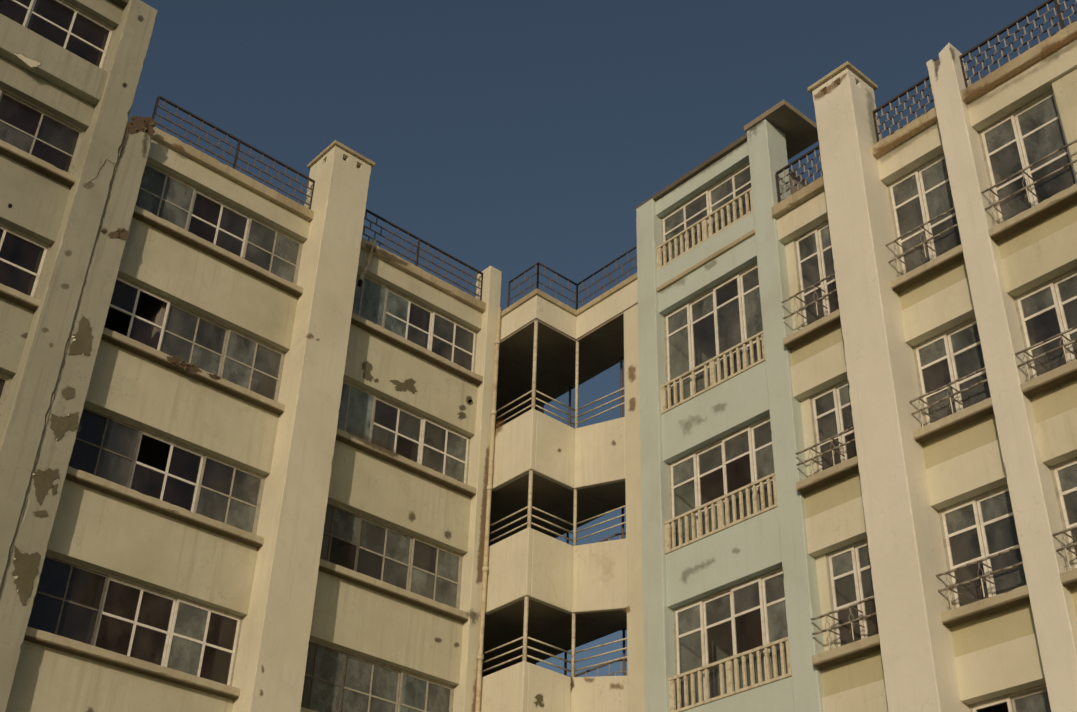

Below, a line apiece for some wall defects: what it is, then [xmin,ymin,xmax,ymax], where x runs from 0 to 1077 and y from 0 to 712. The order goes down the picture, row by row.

spalling [127,115,156,137]
spalling [101,228,129,240]
peeling [68,316,93,356]
crack [0,125,128,598]
peeling [62,386,75,400]
peeling [362,361,418,394]
peeling [50,412,79,441]
peeling [32,468,60,517]
peeling [12,546,41,605]